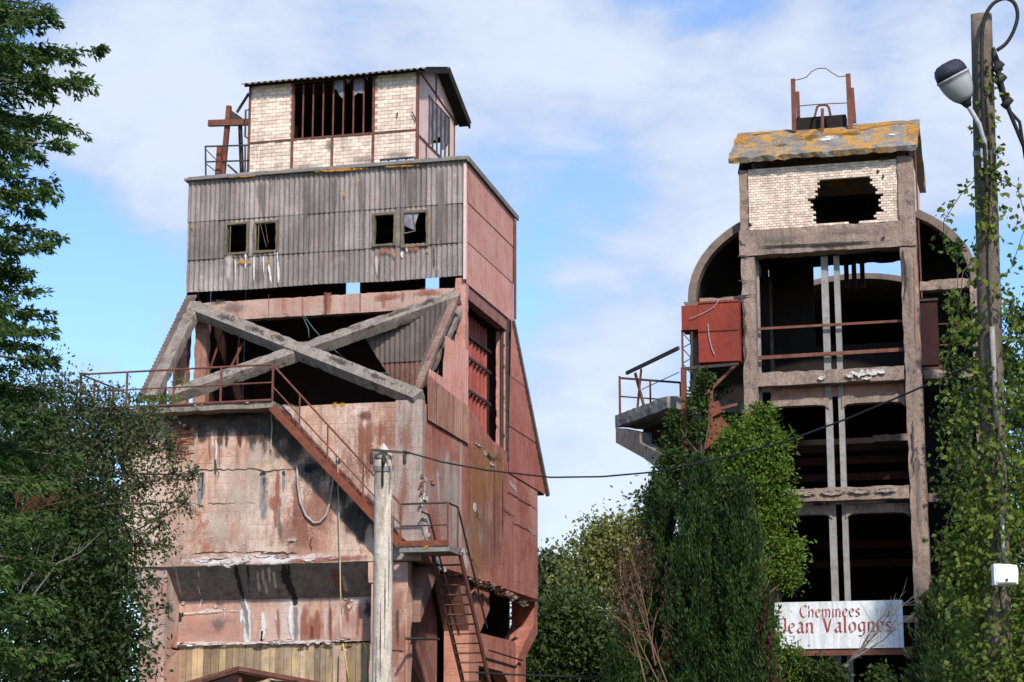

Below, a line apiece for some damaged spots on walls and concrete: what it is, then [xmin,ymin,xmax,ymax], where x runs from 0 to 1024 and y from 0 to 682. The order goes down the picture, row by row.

efflorescence [226,253,280,282]
spalling [844,368,887,380]
leakage [164,412,374,545]
rust [269,480,334,545]
peeling [197,542,252,564]
leakage [194,554,366,644]